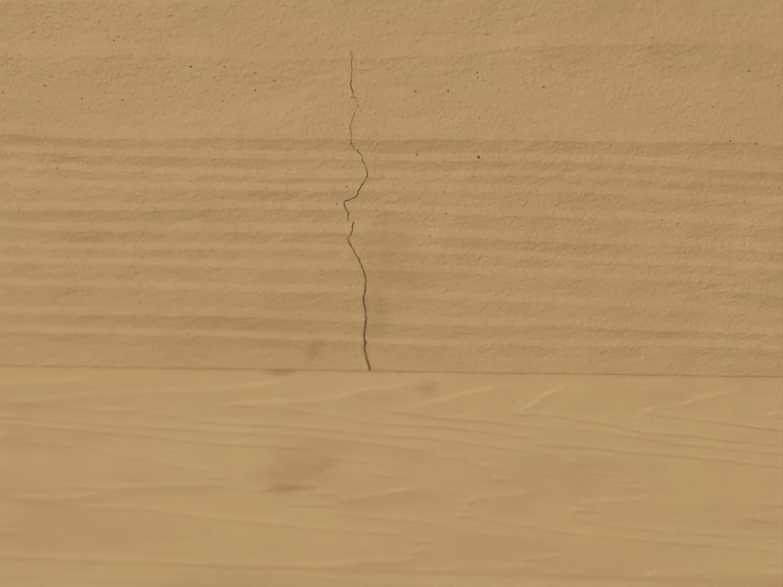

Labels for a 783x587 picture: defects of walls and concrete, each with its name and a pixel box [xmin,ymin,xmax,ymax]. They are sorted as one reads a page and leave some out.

crack [344,51,372,371]